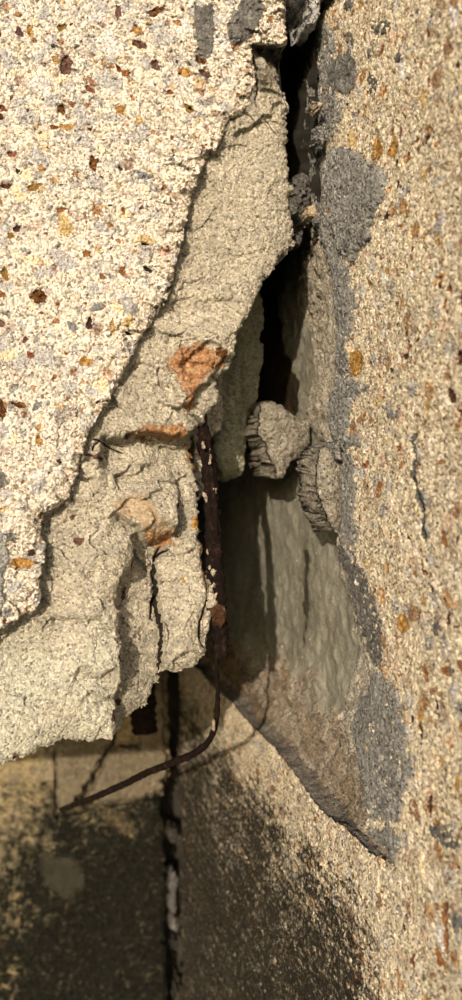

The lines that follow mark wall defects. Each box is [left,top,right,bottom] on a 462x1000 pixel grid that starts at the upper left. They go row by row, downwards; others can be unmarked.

crack [253,2,324,206]
rust [167,341,228,412]
spalling [0,44,396,871]
crack [259,258,285,295]
rust [126,414,270,722]
crack [302,550,310,643]
rust [129,683,157,736]
leakage [0,679,380,1000]